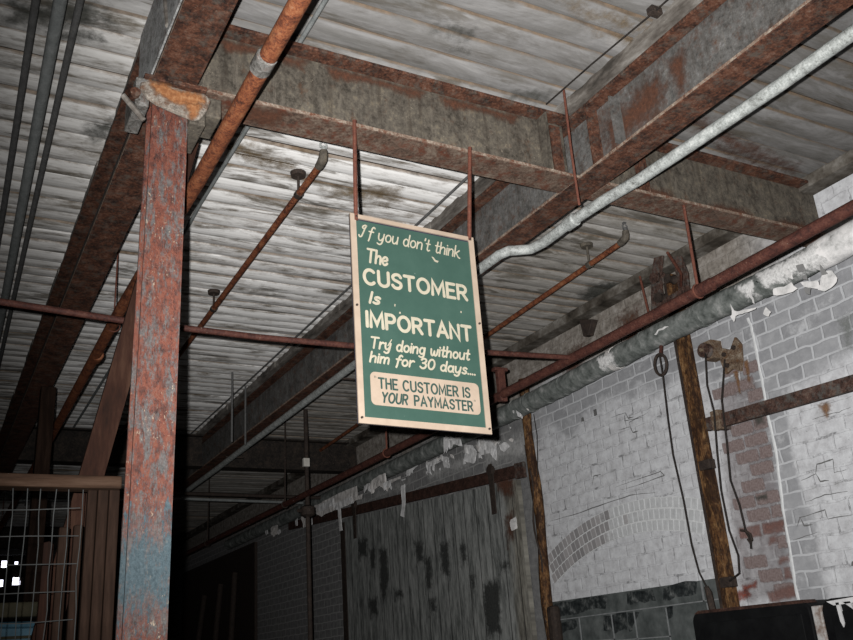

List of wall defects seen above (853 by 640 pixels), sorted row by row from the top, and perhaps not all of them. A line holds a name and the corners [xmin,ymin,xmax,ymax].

corrosion [150,81,206,118]
corrosion [621,79,666,135]
peeling [712,360,764,402]
crack [611,412,648,433]
peeling [357,431,525,505]
peeling [722,416,796,602]
crack [794,459,849,540]